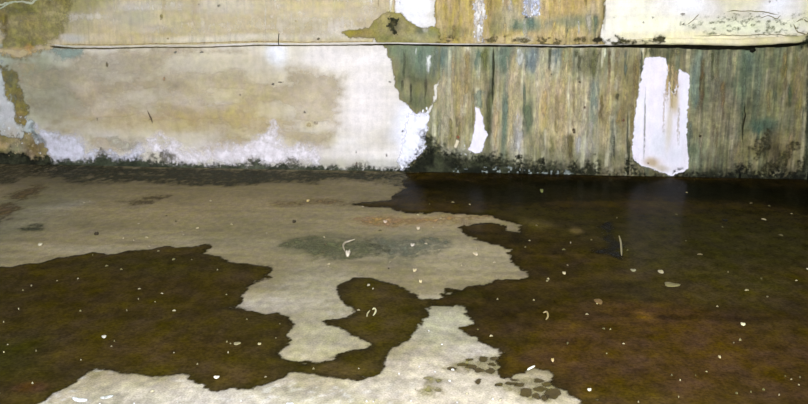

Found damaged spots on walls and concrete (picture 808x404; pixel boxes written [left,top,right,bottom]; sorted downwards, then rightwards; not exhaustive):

crack [0,0,36,9]
spalling [386,16,399,35]
peeling [472,0,487,42]
peeling [522,0,540,17]
peeling [0,60,51,160]
water stain [0,0,808,186]
peeling [397,107,430,170]
peeling [454,91,488,155]
peeling [632,57,690,176]
water stain [279,236,449,260]